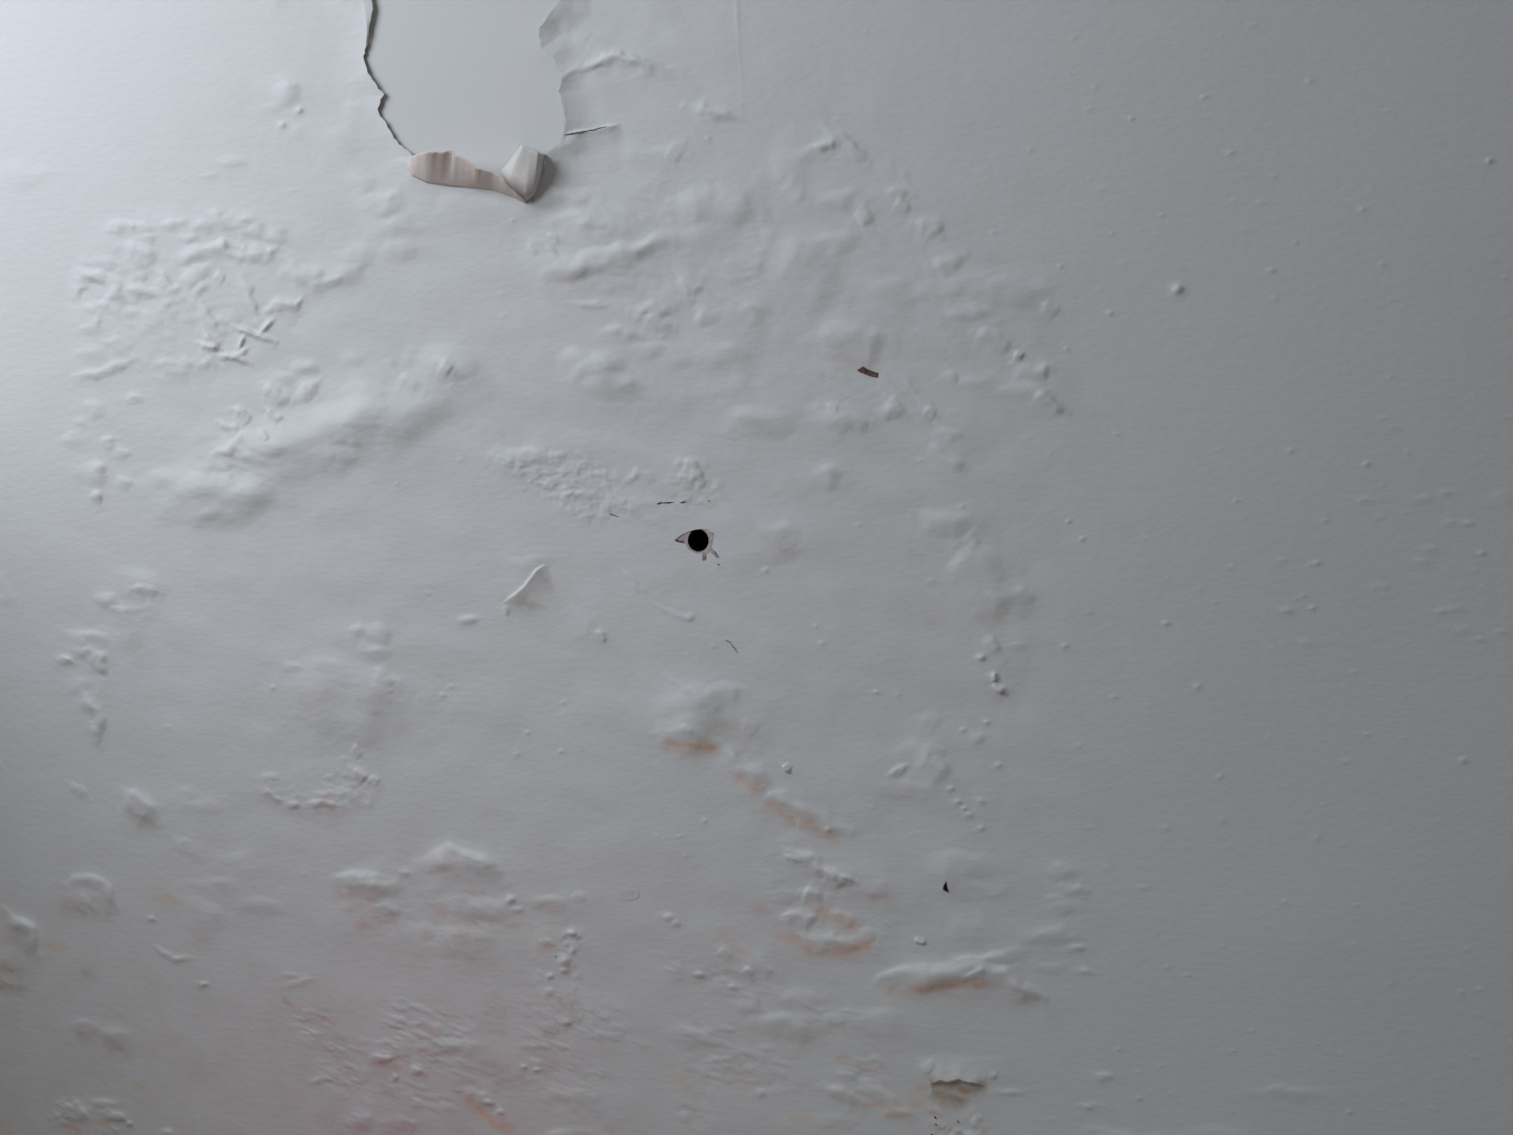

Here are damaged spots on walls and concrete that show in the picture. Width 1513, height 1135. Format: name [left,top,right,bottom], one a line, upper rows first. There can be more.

peeling [298,0,749,220]